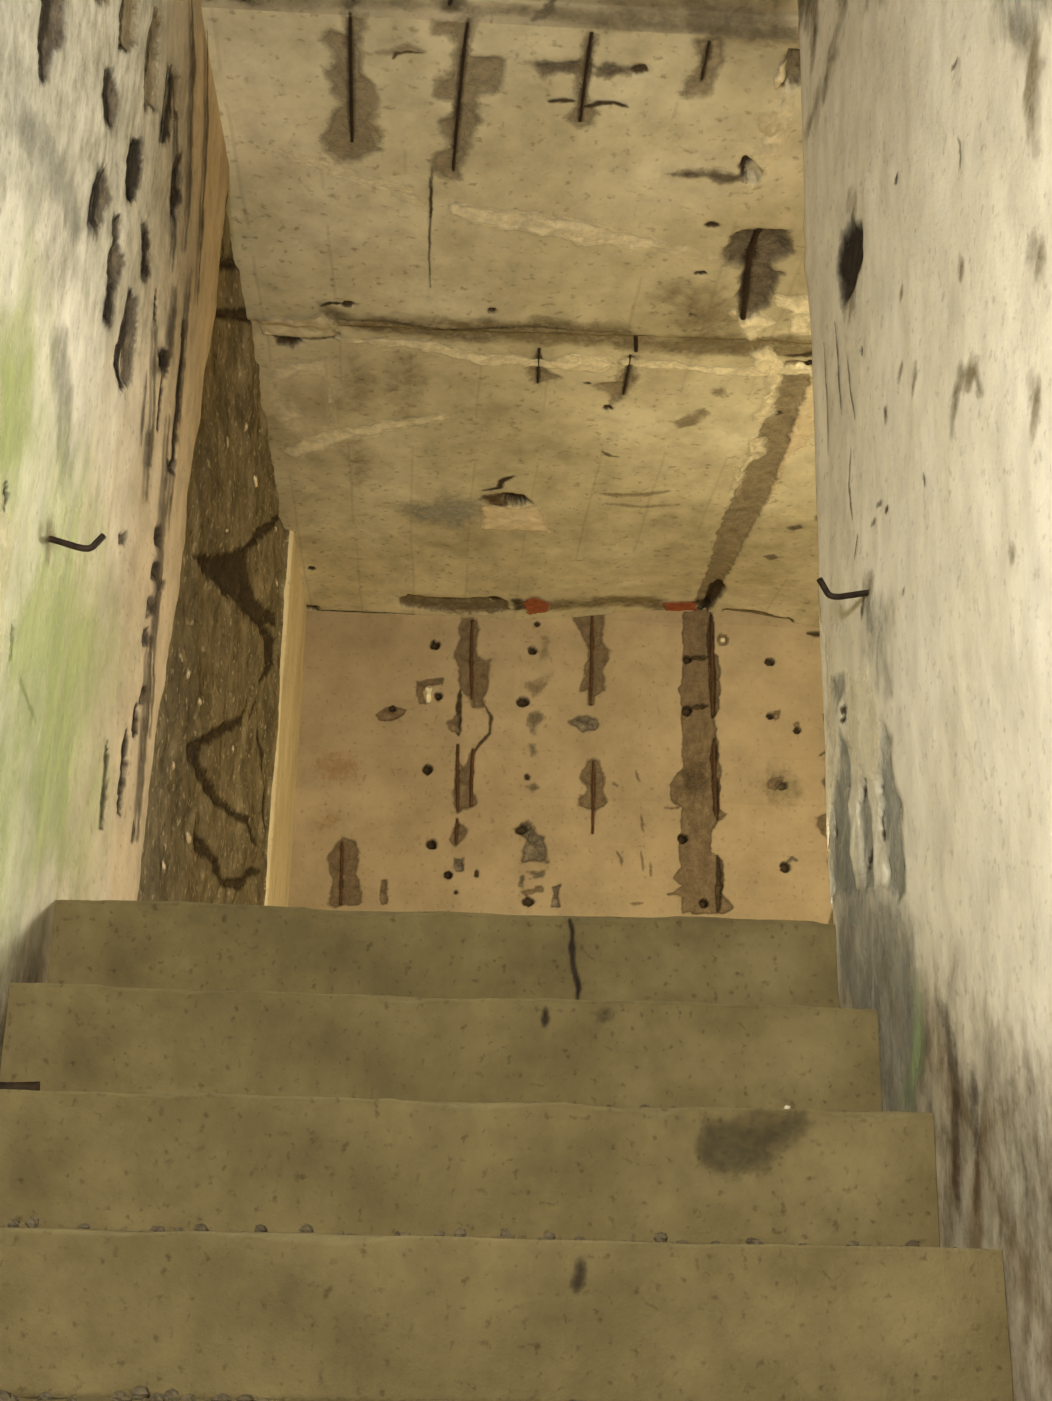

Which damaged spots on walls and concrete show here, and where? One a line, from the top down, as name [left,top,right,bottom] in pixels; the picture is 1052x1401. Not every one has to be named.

flaking render [37,0,65,83]
flaking render [97,0,182,219]
spalling [321,0,381,160]
spalling [433,0,504,179]
spalling [548,32,648,127]
flaking render [88,138,151,390]
crack [98,0,354,890]
crack [306,605,414,615]
flaking render [376,594,551,721]
flaking render [654,228,812,914]
peeling [817,675,904,900]
crack [542,919,581,1027]